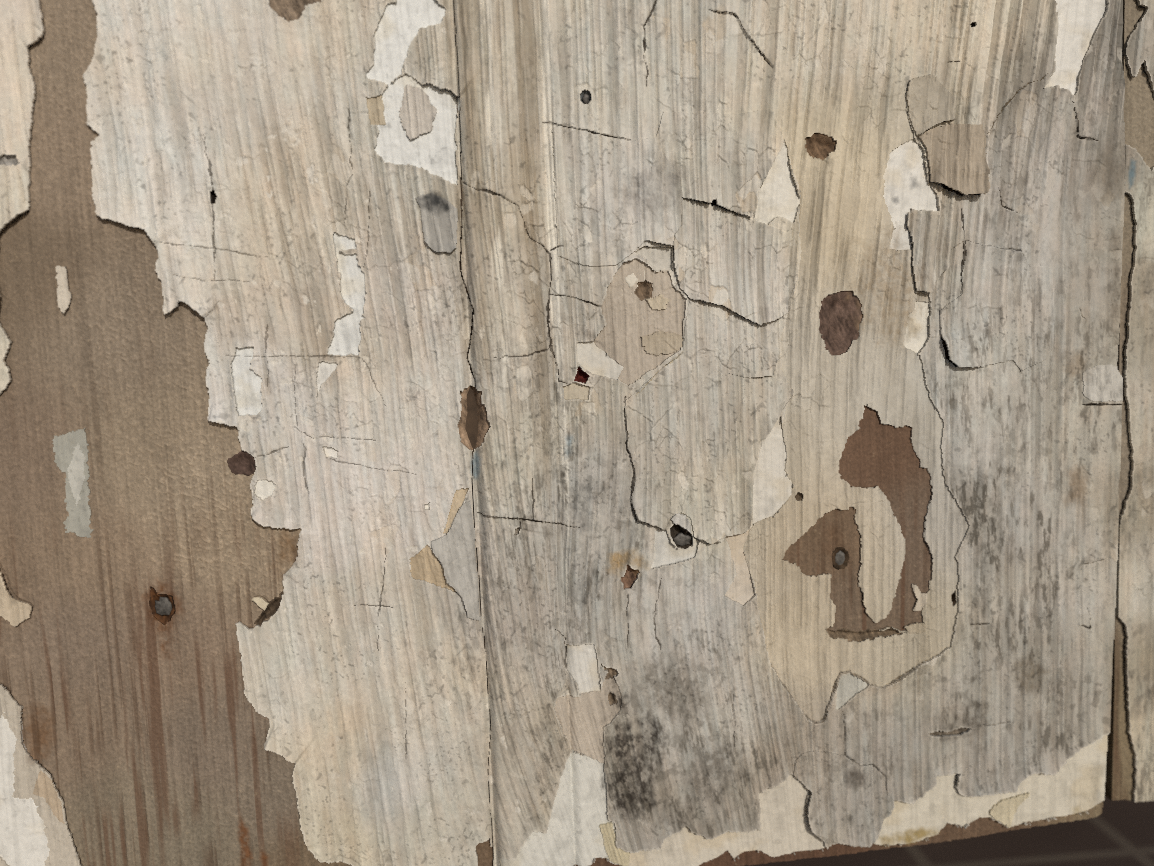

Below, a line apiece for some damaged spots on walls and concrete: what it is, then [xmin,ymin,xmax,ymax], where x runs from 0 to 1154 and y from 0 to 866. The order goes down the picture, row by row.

peeling [366,0,460,185]
crack [542,121,631,141]
crack [643,0,657,87]
crack [709,9,773,68]
peeling [0,0,352,866]
peeling [316,232,367,398]
crack [477,478,580,529]
crack [462,182,602,385]
crack [624,351,683,530]
peeling [552,59,1055,721]
crack [960,208,1029,293]
damp [594,650,768,845]